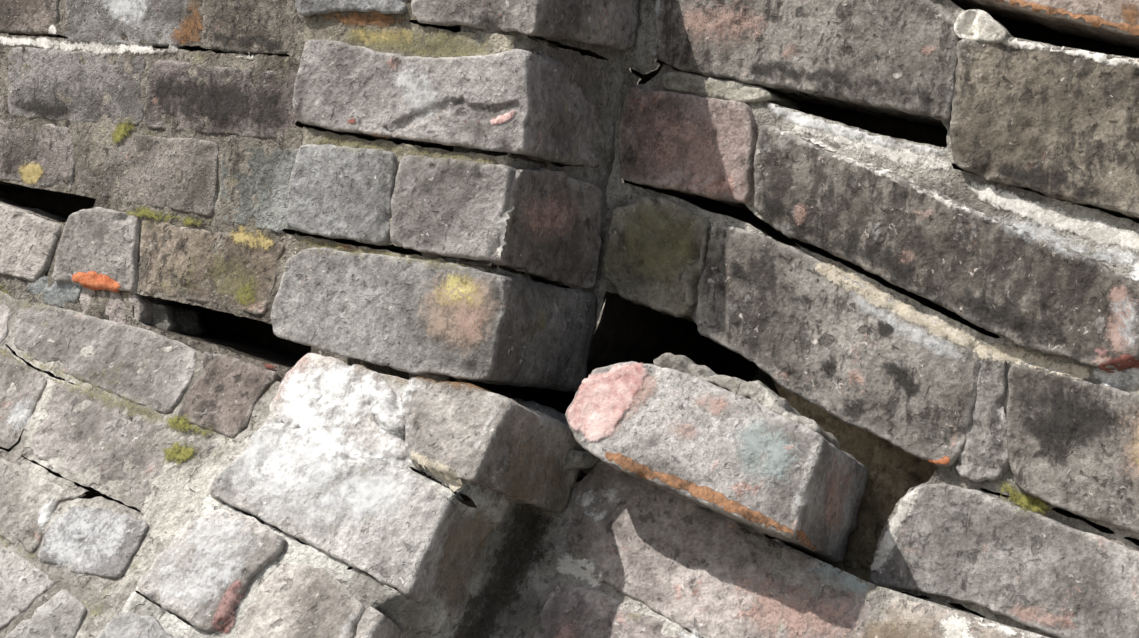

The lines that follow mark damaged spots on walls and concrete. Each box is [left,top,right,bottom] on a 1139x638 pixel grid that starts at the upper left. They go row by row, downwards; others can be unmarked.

crack [7,346,76,385]
crack [0,447,140,512]